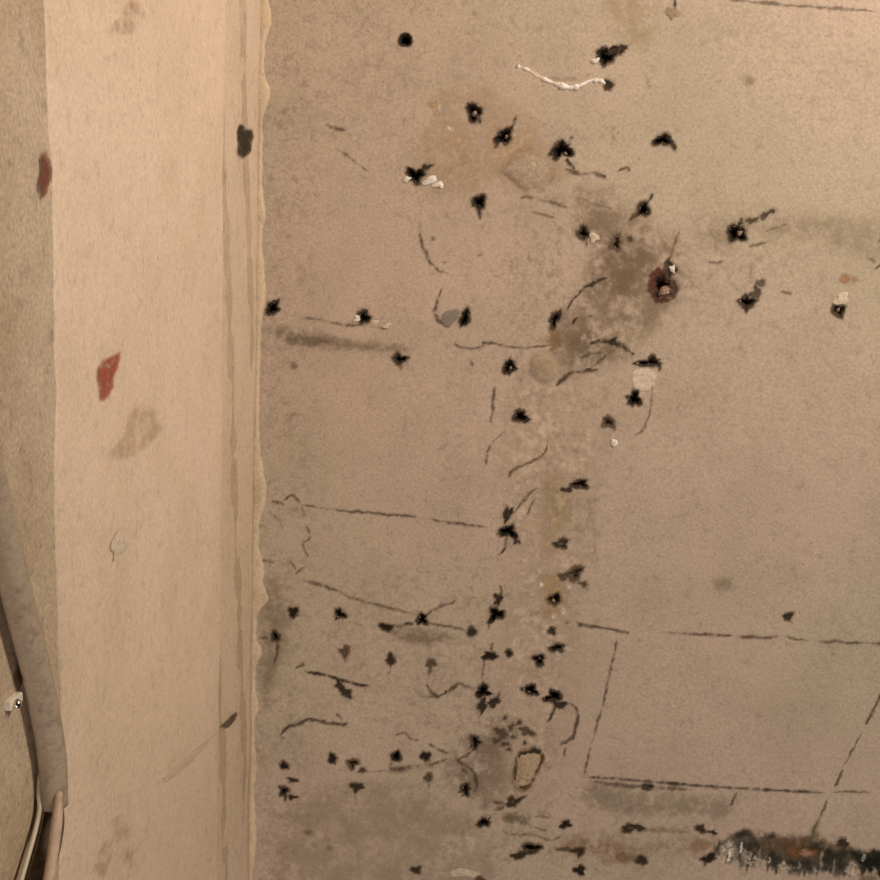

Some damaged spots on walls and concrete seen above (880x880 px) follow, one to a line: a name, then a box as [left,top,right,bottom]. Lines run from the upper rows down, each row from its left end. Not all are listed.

water stain [517,64,605,90]
crack [419,234,547,365]
crack [568,277,606,324]
crack [557,337,634,385]
crack [273,494,484,630]
crack [296,663,368,687]
crack [281,714,348,735]
spalling [470,734,482,750]
crack [561,703,579,755]
flaking render [475,716,545,827]